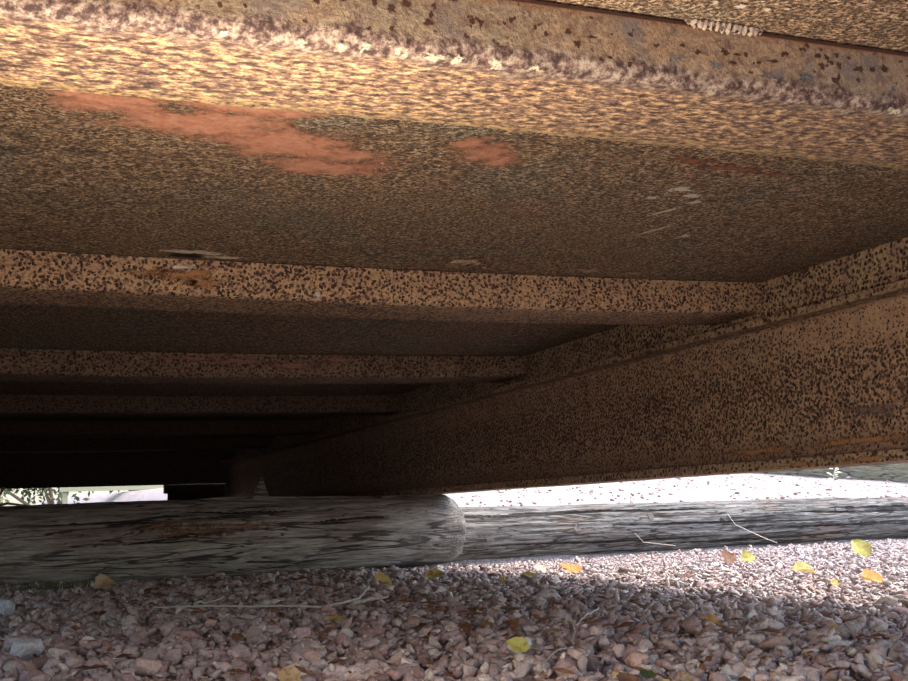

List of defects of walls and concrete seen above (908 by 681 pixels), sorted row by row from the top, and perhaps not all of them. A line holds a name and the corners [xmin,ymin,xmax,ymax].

corrosion [721,48,789,65]
corrosion [805,43,841,70]